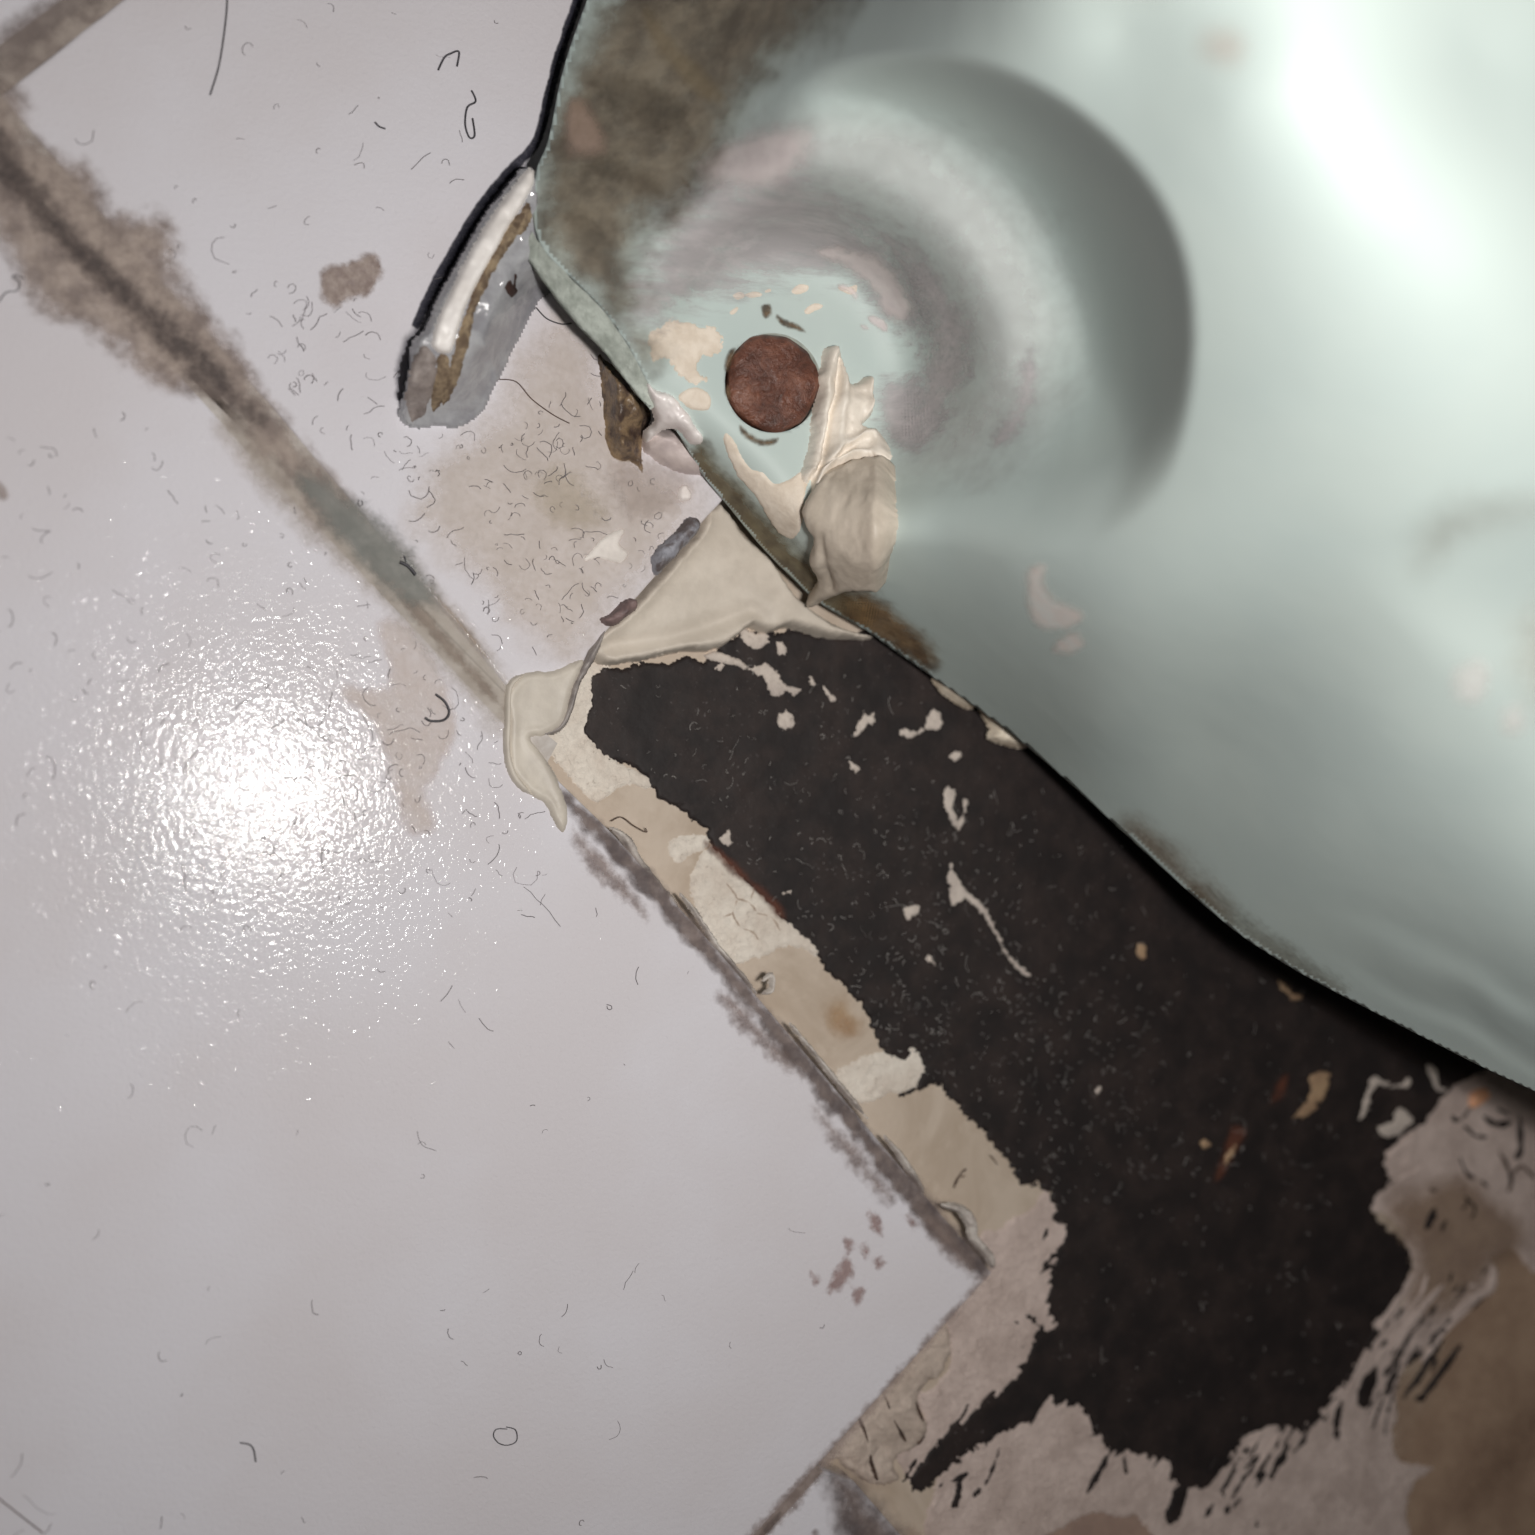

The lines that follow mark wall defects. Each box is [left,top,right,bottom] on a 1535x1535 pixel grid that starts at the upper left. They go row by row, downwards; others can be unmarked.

leakage [0,144,244,409]
rust [762,305,803,331]
rust [726,349,734,398]
rust [740,427,777,445]
peeling [650,485,700,576]
leakage [302,477,494,698]
peeling [600,598,637,626]
peeling [740,629,836,730]
peeling [899,709,943,739]
peeling [943,786,969,831]
peeling [947,863,1031,977]
peeling [1358,1076,1414,1137]